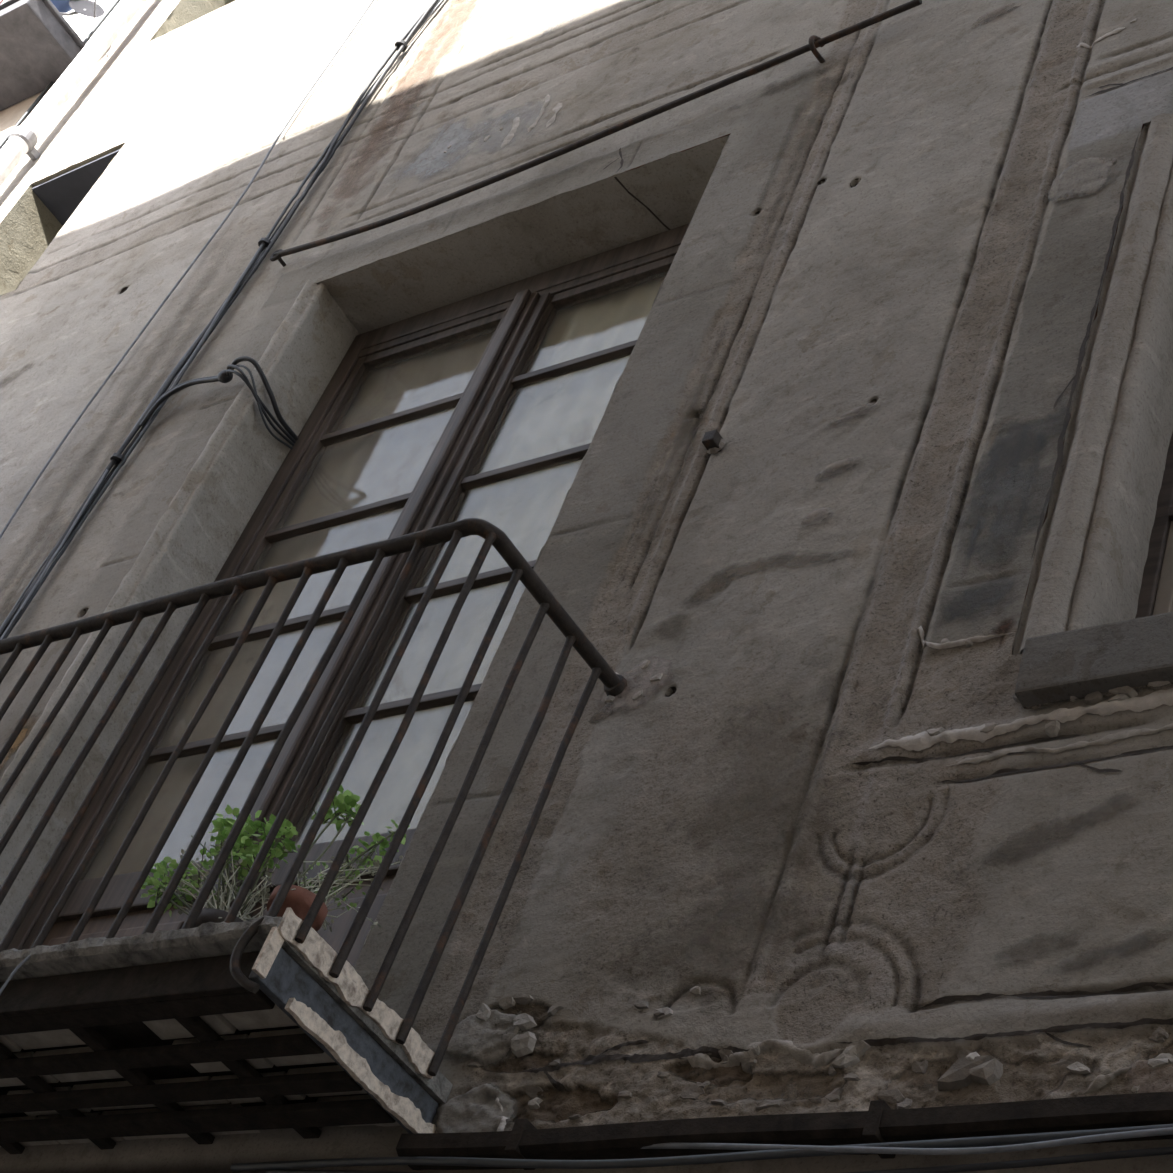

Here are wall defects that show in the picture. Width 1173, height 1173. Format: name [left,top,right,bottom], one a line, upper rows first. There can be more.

flaking render [866,681,1173,766]
flaking render [468,994,566,1073]
flaking render [506,1085,632,1123]
flaking render [657,1039,871,1111]
flaking render [876,1026,1173,1110]